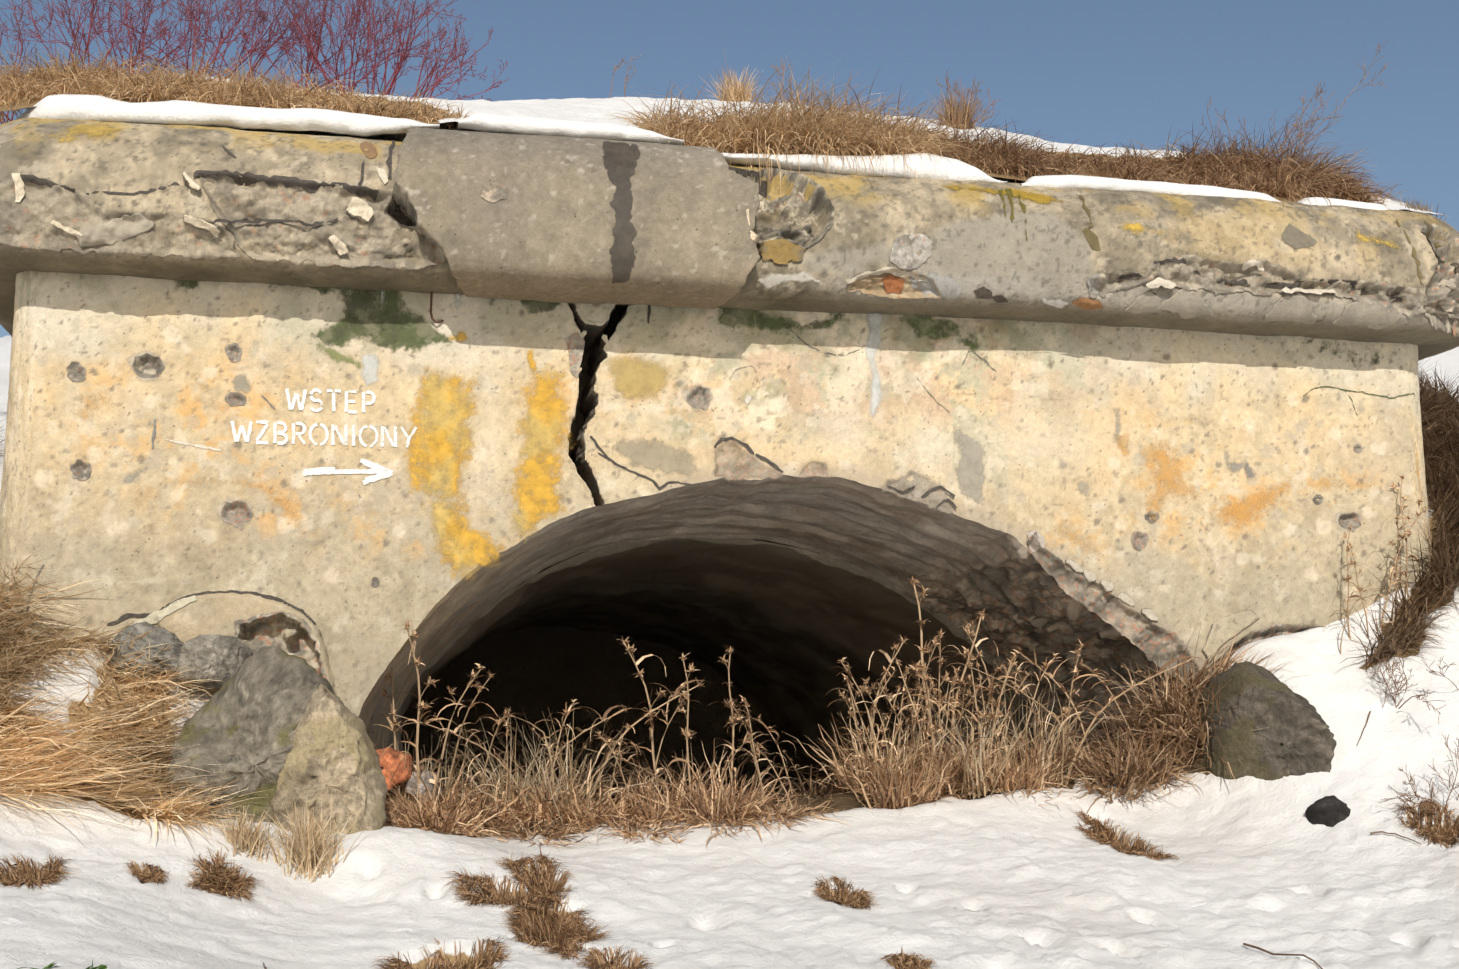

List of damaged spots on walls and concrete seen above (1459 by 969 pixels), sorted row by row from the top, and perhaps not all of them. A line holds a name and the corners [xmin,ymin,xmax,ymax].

spalling [0,146,445,270]
leakage [603,141,640,283]
spalling [746,168,835,288]
spalling [1043,224,1459,338]
crack [563,303,693,507]